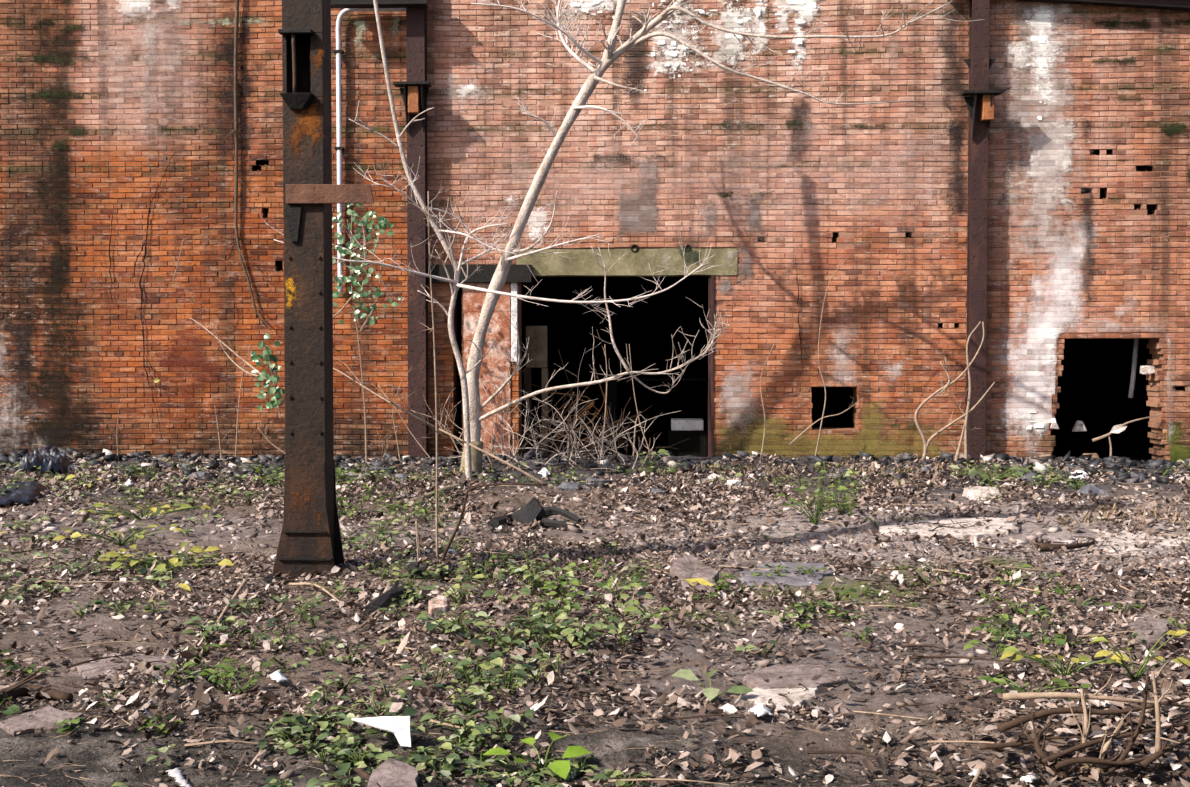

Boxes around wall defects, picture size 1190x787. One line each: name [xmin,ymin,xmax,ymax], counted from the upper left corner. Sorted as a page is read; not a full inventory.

peeling [566,0,618,18]
peeling [645,0,820,92]
rust [289,104,323,155]
damp [0,0,92,454]
damp [1004,3,1094,425]
crack [108,154,174,442]
damp [722,369,752,423]